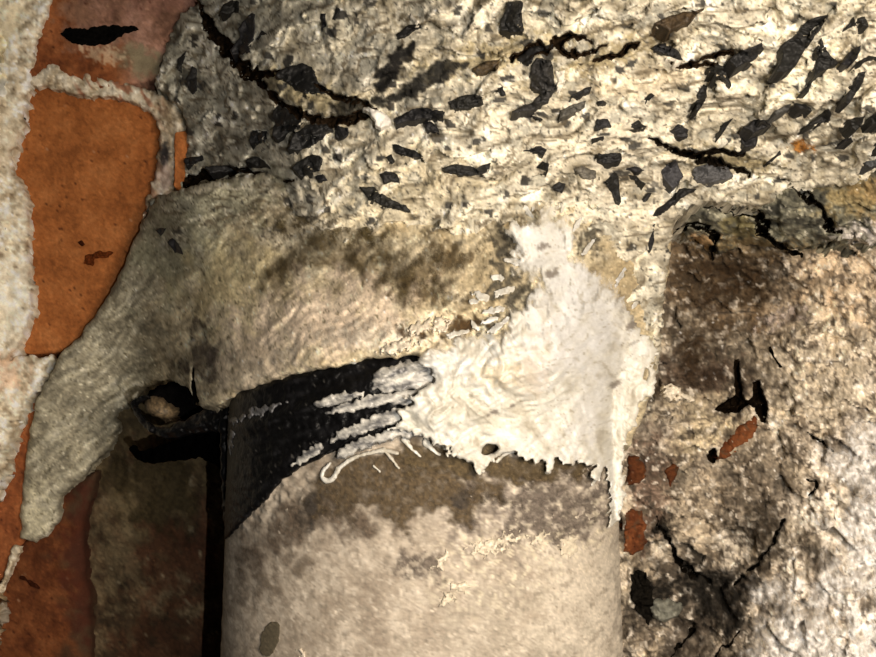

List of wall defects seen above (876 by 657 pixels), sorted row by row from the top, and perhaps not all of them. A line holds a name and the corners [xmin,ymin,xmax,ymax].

spalling [176,51,198,95]
crack [197,0,378,128]
crack [648,137,750,179]
spalling [78,240,113,266]
spalling [156,228,183,255]
crack [655,516,711,584]
crack [733,519,786,586]
crack [671,622,696,657]
crack [714,631,740,657]